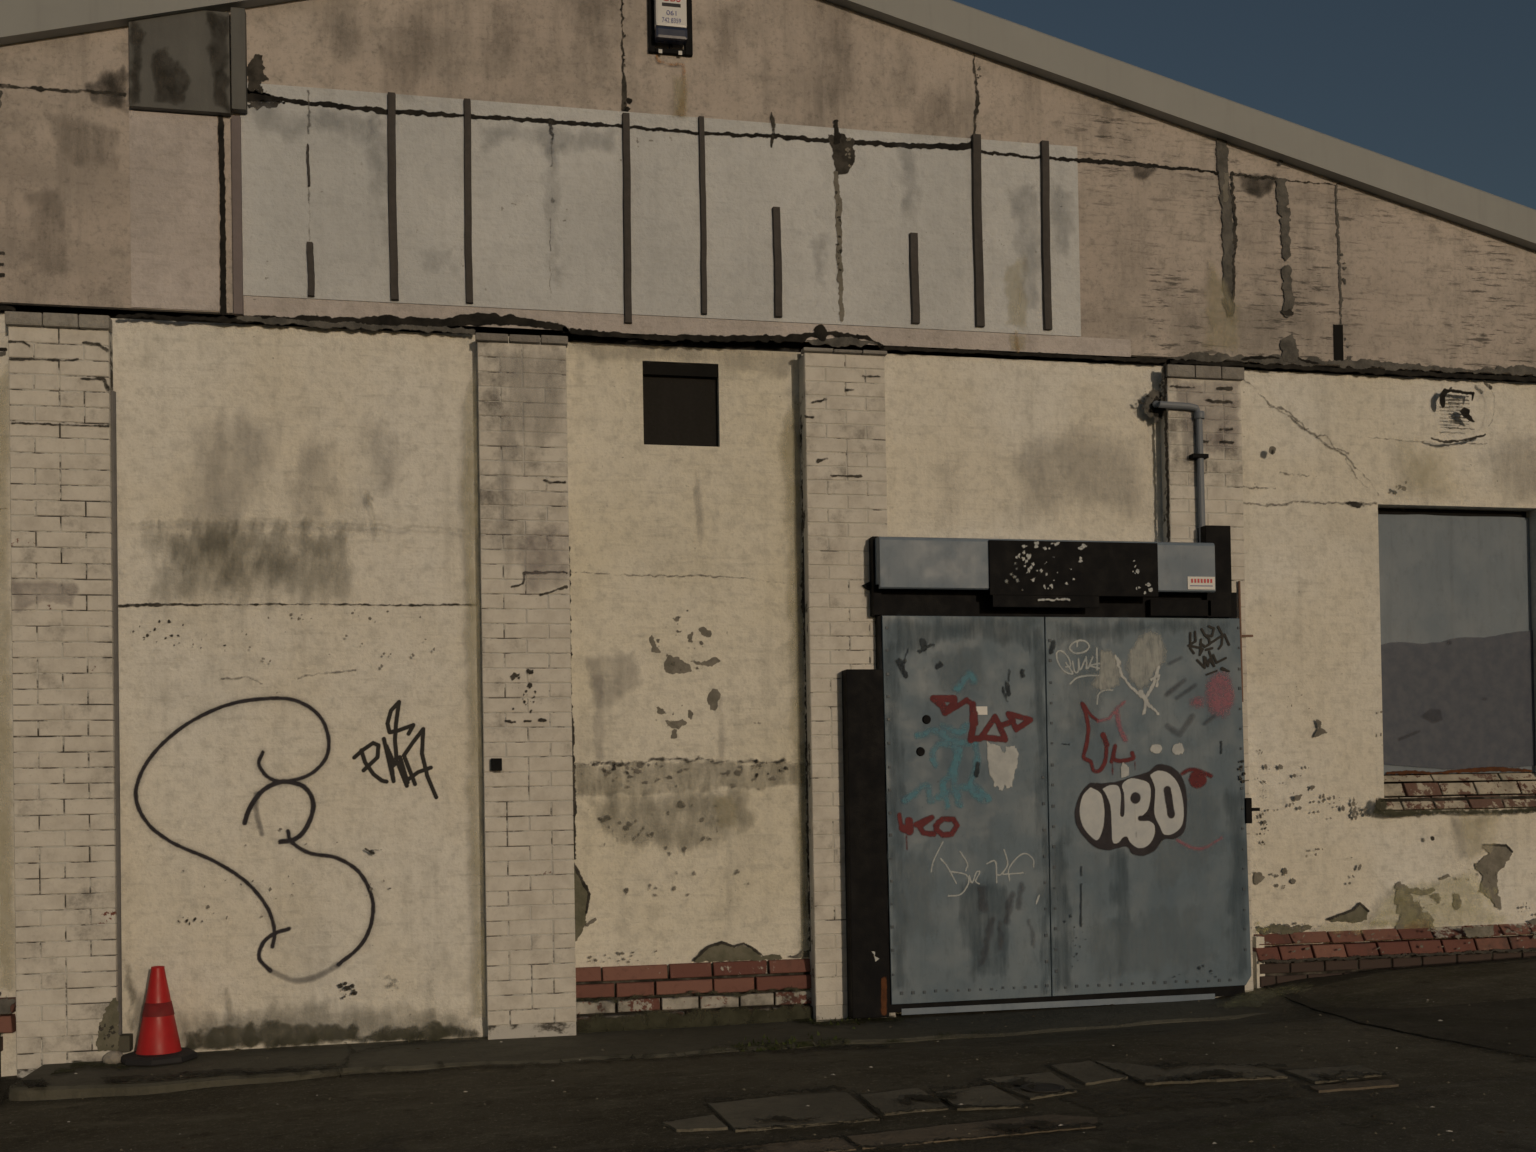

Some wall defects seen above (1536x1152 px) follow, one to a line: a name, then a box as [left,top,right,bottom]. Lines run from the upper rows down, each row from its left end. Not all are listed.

crack [0,84,126,108]
spalling [1216,138,1238,317]
spalling [1276,160,1299,363]
crack [0,305,110,391]
crack [11,420,109,428]
spalling [1431,380,1492,443]
crack [116,0,1536,951]
peeling [649,610,720,674]
peeling [657,689,721,739]
peeling [592,756,788,856]
peeling [1238,749,1368,845]
spalling [1254,843,1536,964]